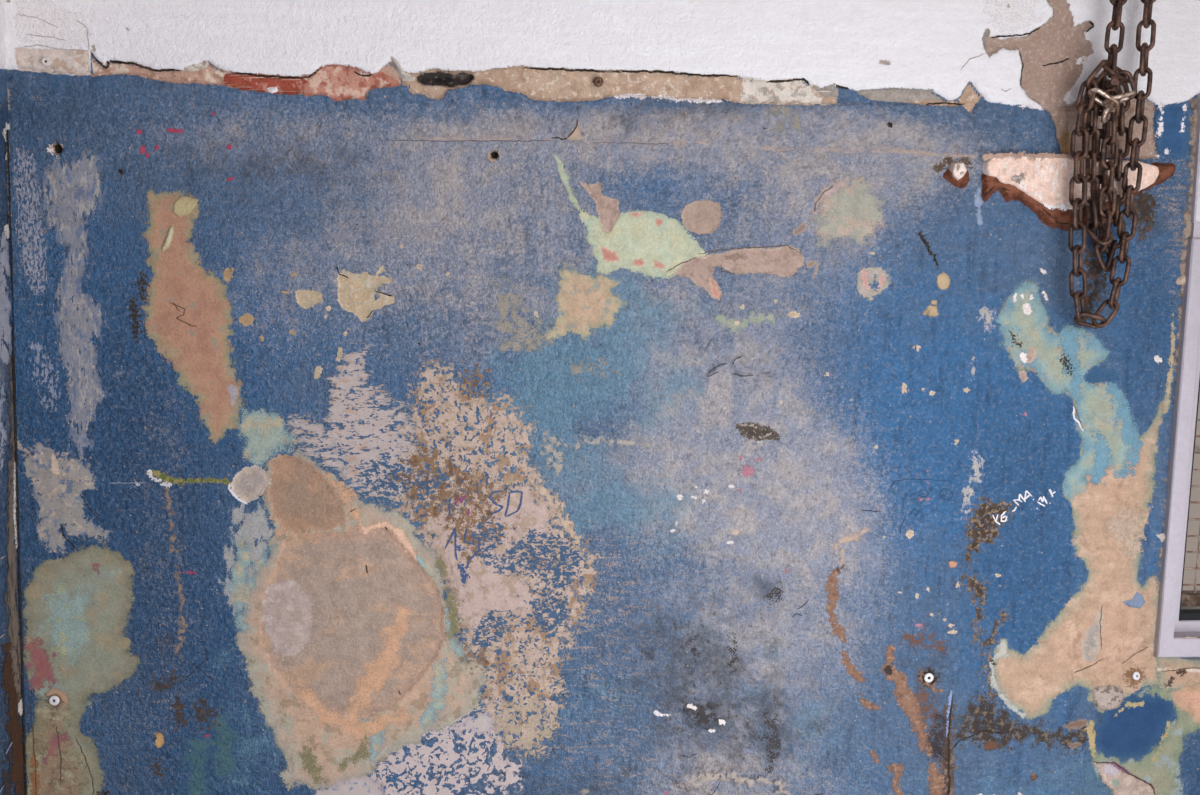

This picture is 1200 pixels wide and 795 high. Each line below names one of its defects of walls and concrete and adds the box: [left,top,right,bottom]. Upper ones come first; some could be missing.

flaking render [15,48,984,141]
peeling [534,154,805,344]
peeling [854,252,891,301]
peeling [922,272,951,317]
peeling [0,145,135,555]
flaking render [932,0,1200,720]
flaking render [735,422,780,441]
flaking render [125,187,487,792]
corrosion [825,526,953,767]
corrosion [868,750,904,795]
flaking render [1093,761,1156,795]